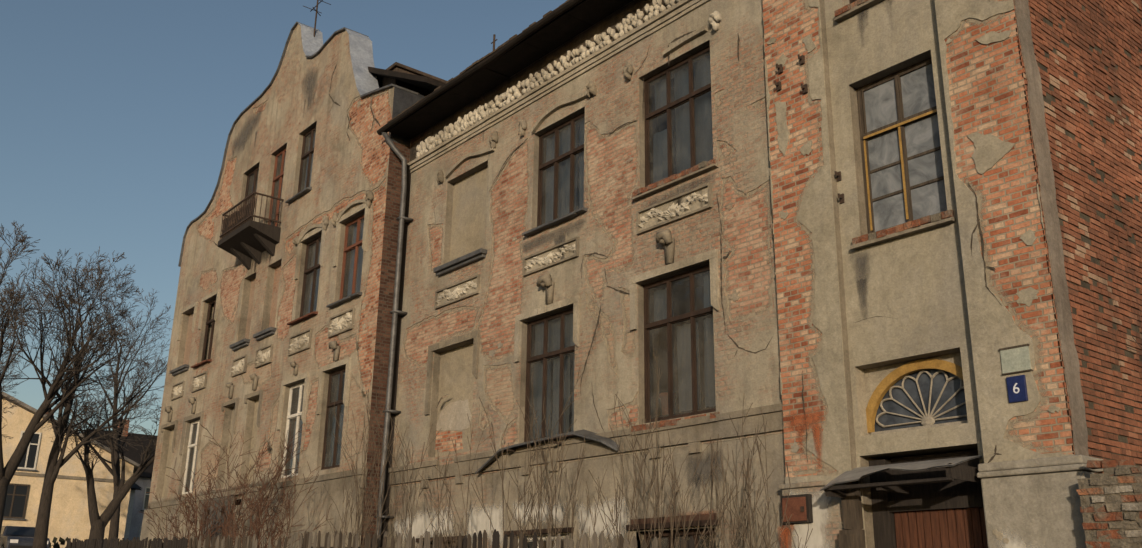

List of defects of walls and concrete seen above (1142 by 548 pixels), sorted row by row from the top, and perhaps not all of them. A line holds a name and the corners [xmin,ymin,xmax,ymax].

spalling [197,156,237,242]
spalling [276,90,392,463]
spalling [403,138,529,452]
crack [580,252,630,431]
spalling [583,121,640,304]
spalling [607,391,641,431]
crack [717,197,772,355]
spalling [719,0,838,477]
crack [968,183,1002,306]
spalling [945,0,1074,454]
peeling [794,493,830,548]